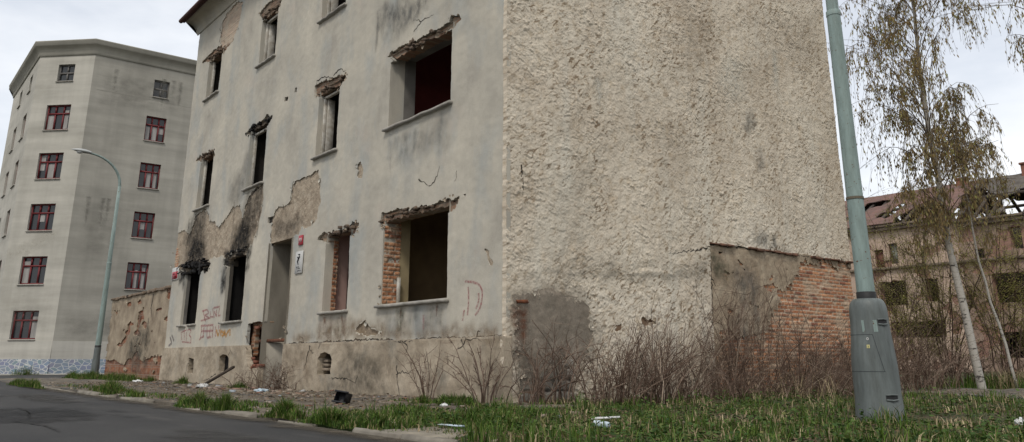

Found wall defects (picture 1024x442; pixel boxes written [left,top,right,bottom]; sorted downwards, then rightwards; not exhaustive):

flaking render [170,171,321,274]
flaking render [104,301,162,380]
flaking render [357,321,379,336]
flaking render [709,242,854,396]